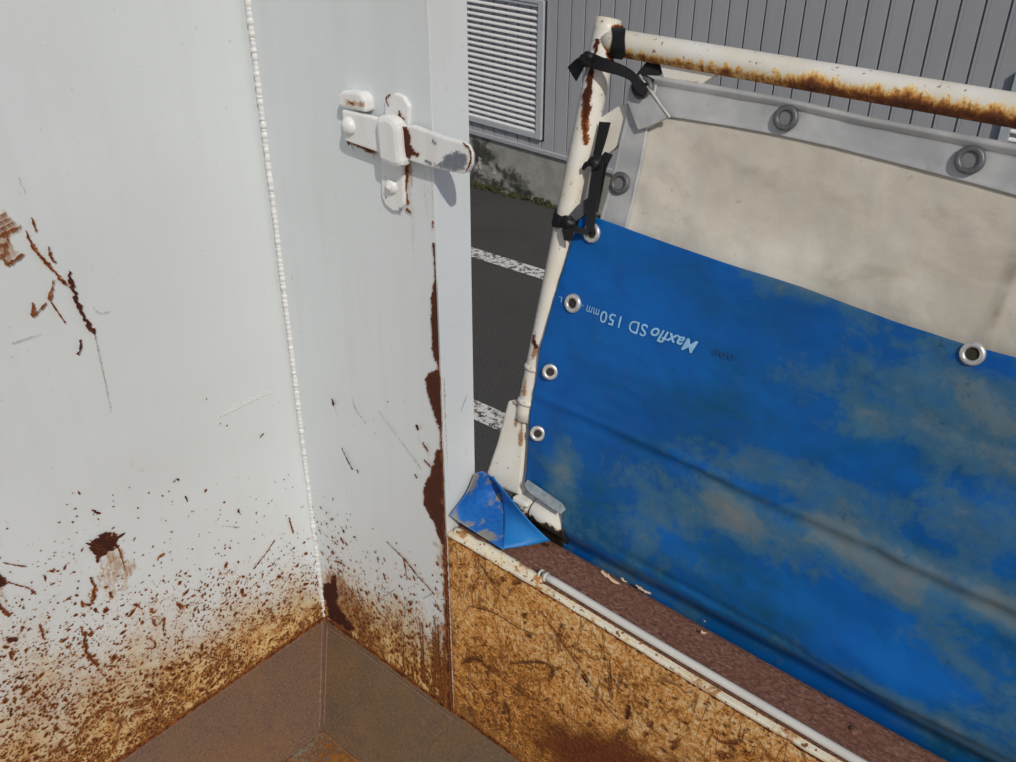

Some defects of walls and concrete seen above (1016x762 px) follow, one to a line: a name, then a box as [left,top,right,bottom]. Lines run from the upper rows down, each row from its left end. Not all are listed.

corrosion [581,68,594,145]
corrosion [399,163,412,214]
corrosion [0,212,24,266]
corrosion [0,496,824,762]